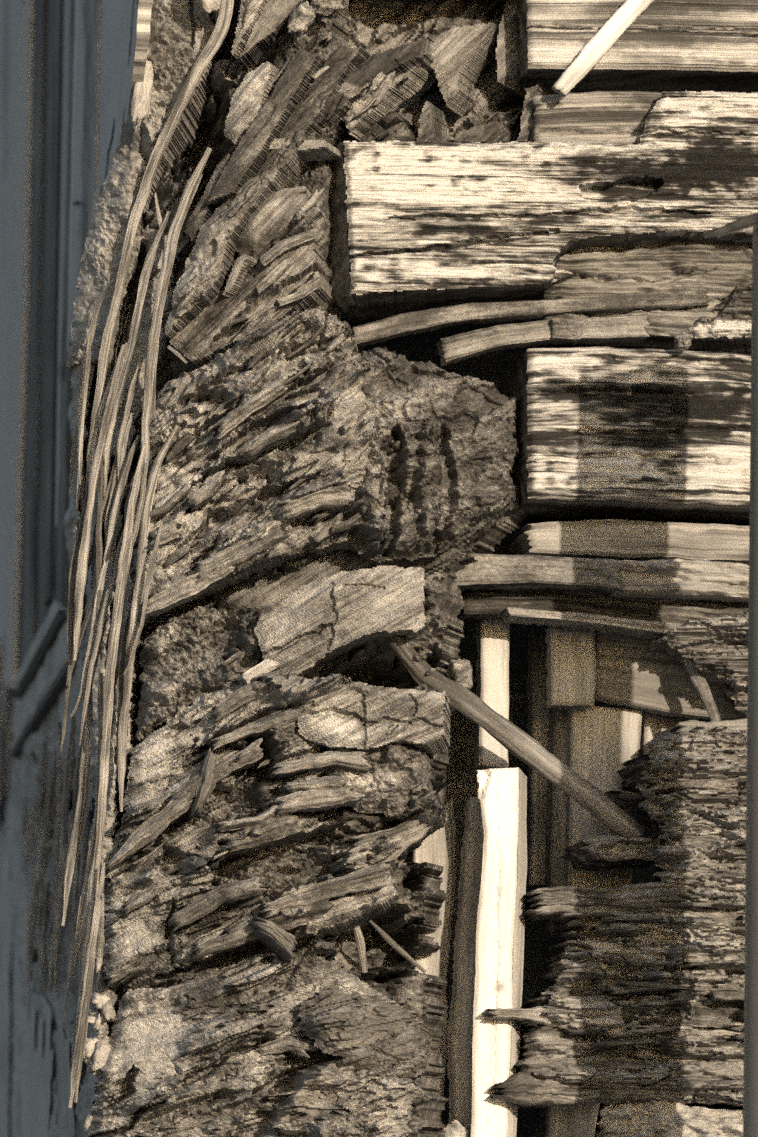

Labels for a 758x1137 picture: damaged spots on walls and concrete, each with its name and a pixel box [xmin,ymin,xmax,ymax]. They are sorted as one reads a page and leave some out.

crack [6,942,14,1137]